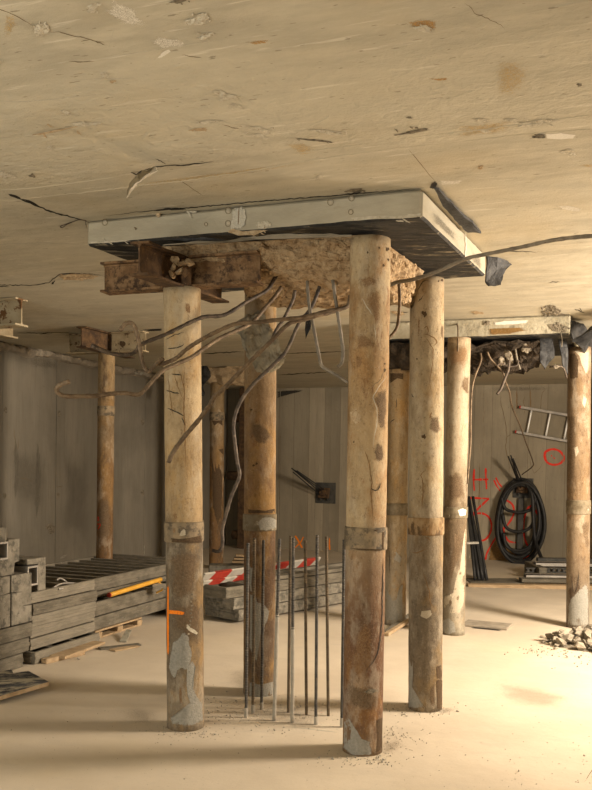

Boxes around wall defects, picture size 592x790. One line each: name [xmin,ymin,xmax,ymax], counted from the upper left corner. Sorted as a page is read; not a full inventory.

crack [9,194,89,227]
crack [0,273,101,287]